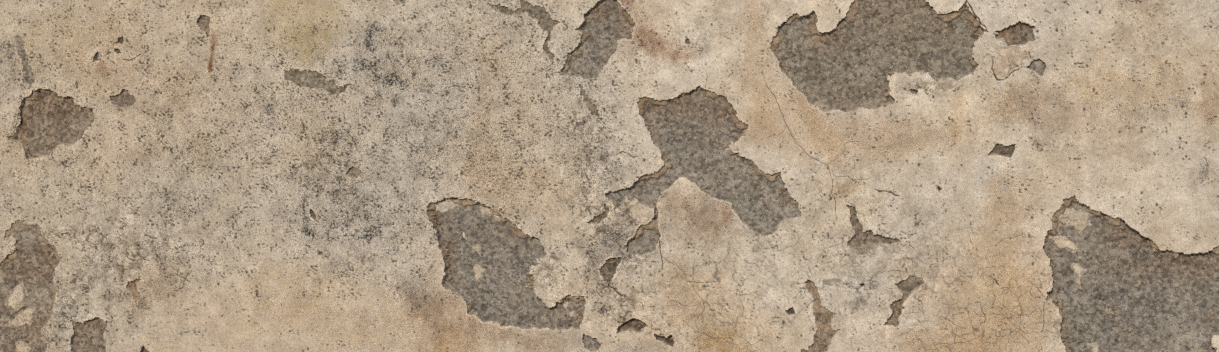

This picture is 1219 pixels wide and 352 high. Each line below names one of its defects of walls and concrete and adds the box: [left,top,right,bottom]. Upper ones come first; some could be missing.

flaking render [8,35,94,159]
peeling [284,68,350,97]
flaking render [487,0,635,116]
flaking render [770,0,1036,112]
flaking render [0,219,61,352]
flaking render [70,317,107,352]
flaking render [426,197,601,352]
flaking render [587,86,801,283]
flaking render [801,280,841,352]
flaking render [846,205,901,255]
flaking render [884,275,924,327]
flaking render [1043,195,1219,352]